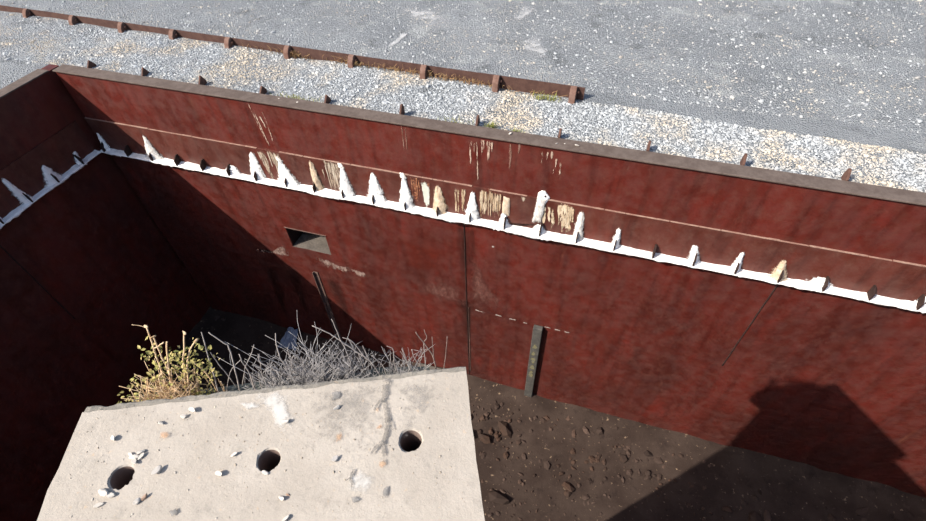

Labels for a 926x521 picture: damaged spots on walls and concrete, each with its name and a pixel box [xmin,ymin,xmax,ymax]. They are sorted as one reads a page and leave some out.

water stain [248,104,280,177]
water stain [322,160,340,189]
peeling [422,183,430,207]
water stain [480,191,501,216]
peeling [541,203,574,233]
crack [371,378,393,456]